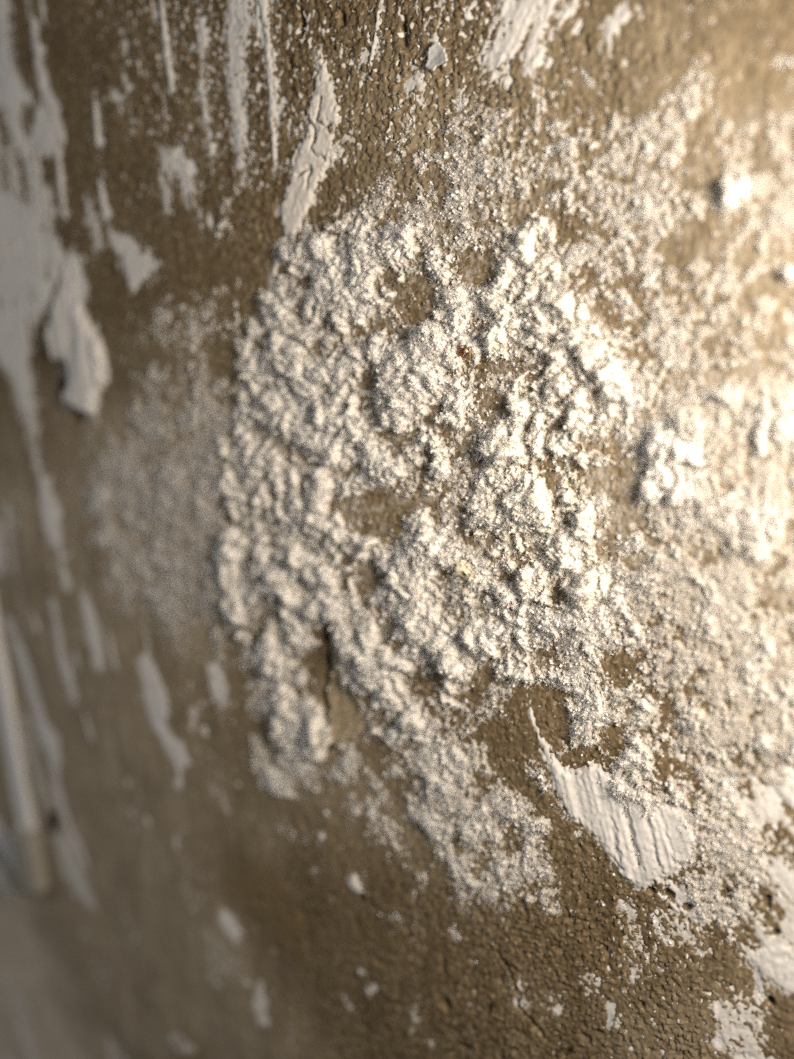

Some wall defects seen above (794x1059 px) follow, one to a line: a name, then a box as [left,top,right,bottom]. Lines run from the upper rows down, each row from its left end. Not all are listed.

peeling [152,0,396,311]
peeling [400,0,646,115]
damp [756,22,794,94]
peeling [0,0,169,741]
damp [60,38,794,948]
peeling [3,614,97,913]
damp [626,914,713,980]
peeling [647,728,794,1059]